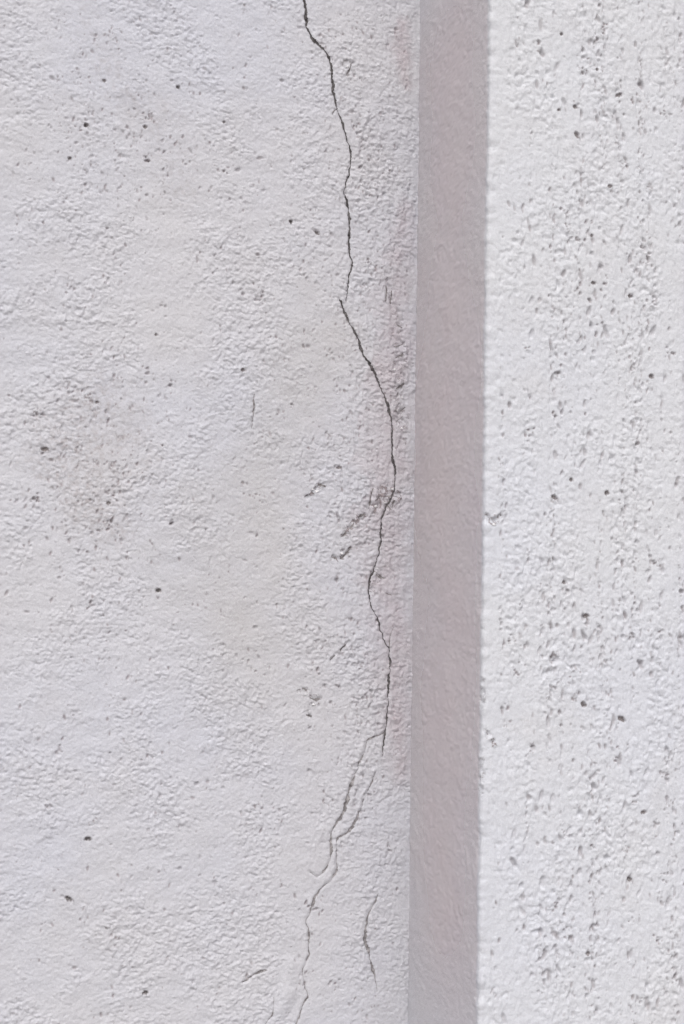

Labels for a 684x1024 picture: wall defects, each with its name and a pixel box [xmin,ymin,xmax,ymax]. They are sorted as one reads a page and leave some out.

crack [266,0,397,1024]